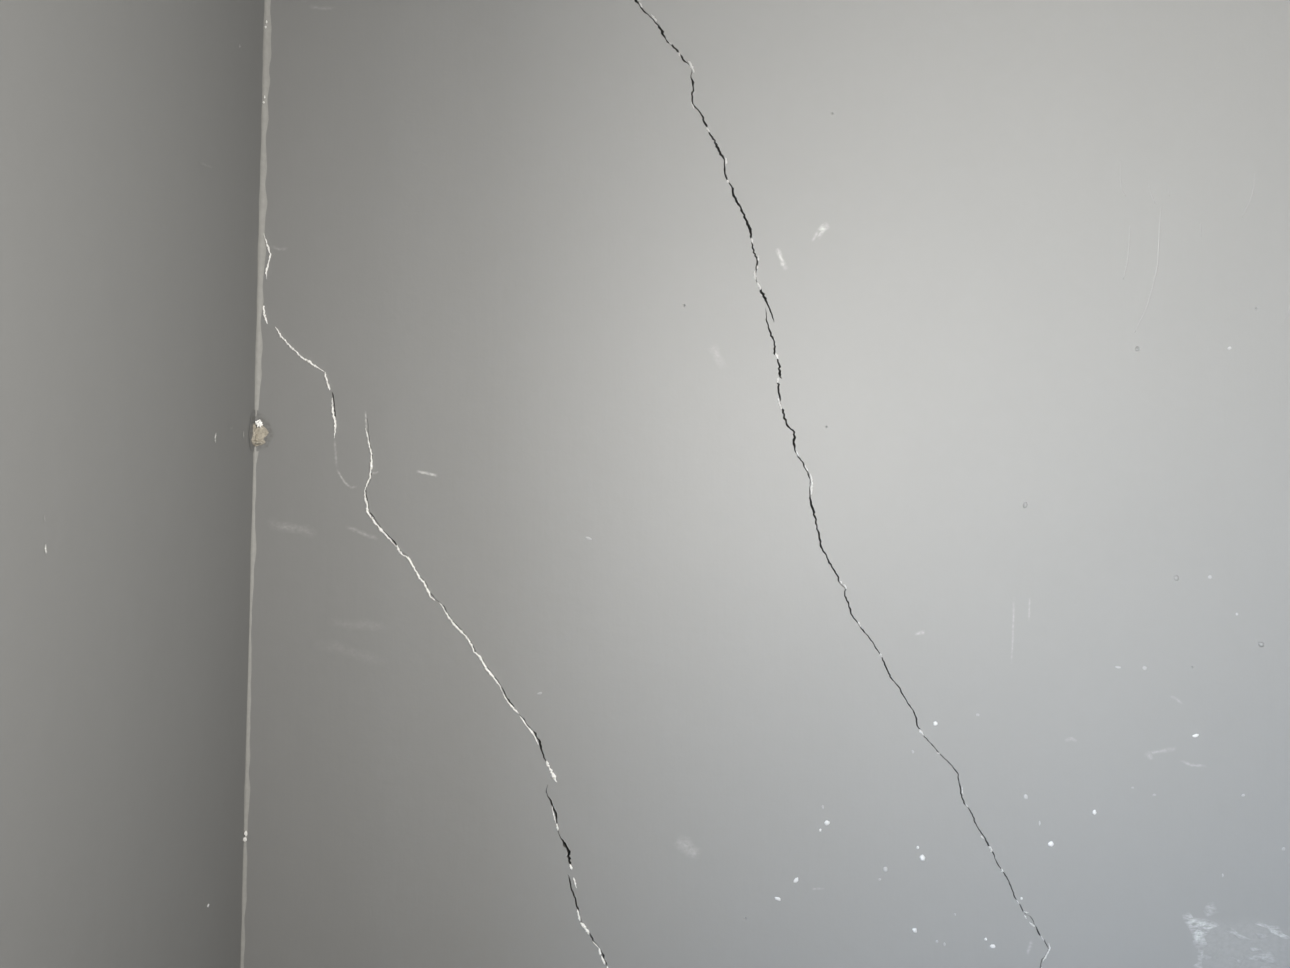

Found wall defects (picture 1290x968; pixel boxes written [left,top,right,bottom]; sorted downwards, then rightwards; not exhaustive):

crack [263,235,608,968]
crack [635,0,1051,968]